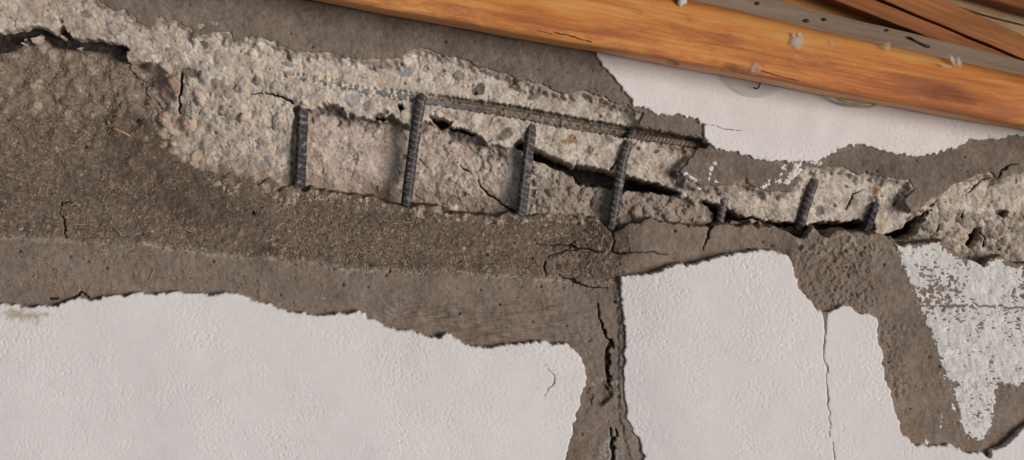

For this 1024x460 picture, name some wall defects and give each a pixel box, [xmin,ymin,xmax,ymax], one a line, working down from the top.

spalling [0,0,800,229]
crack [451,128,475,136]
crack [456,162,516,212]
crack [516,144,669,195]
crack [59,201,75,238]
crack [536,232,668,460]
crack [822,312,835,460]